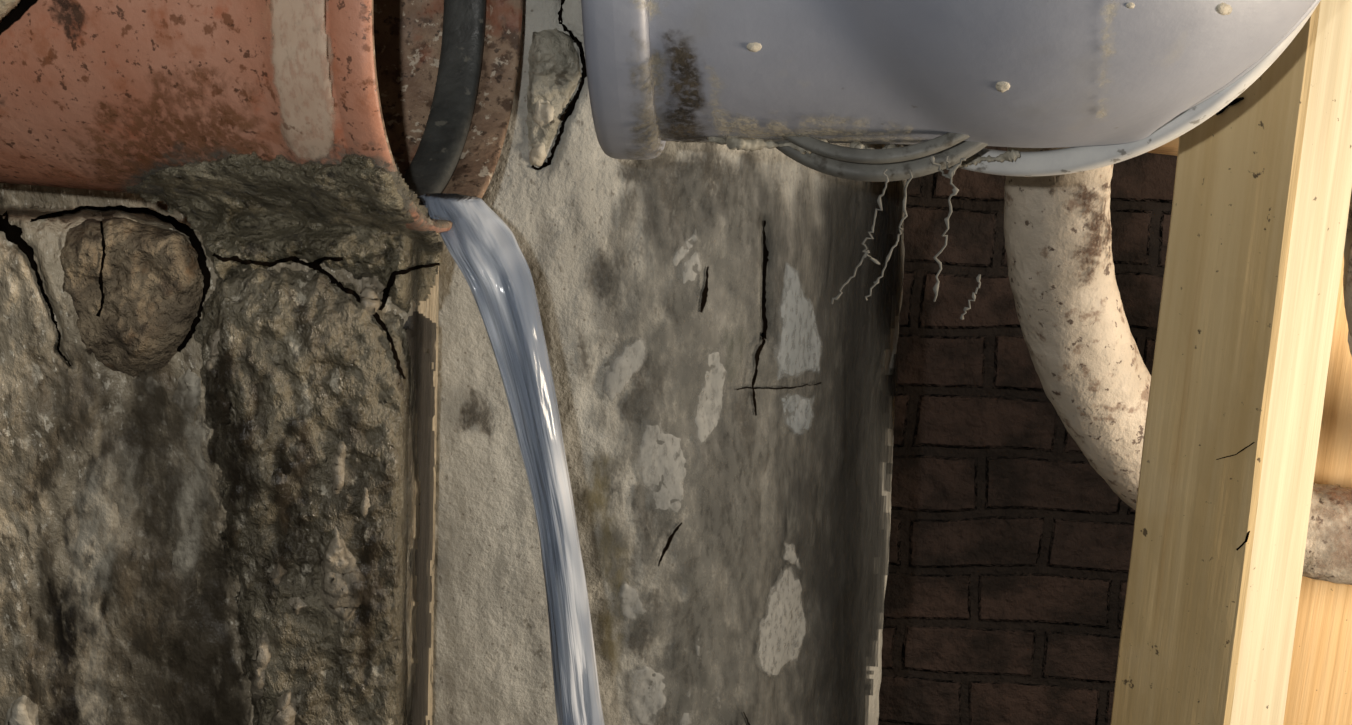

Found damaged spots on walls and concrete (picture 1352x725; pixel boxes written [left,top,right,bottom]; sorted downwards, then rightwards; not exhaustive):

crack [0,0,37,34]
crack [531,0,587,170]
crack [0,205,440,379]
crack [736,220,821,416]
leakage [25,349,313,725]
leakage [352,538,384,684]
leakage [403,311,437,725]
crack [658,522,682,566]
leakage [589,142,902,725]